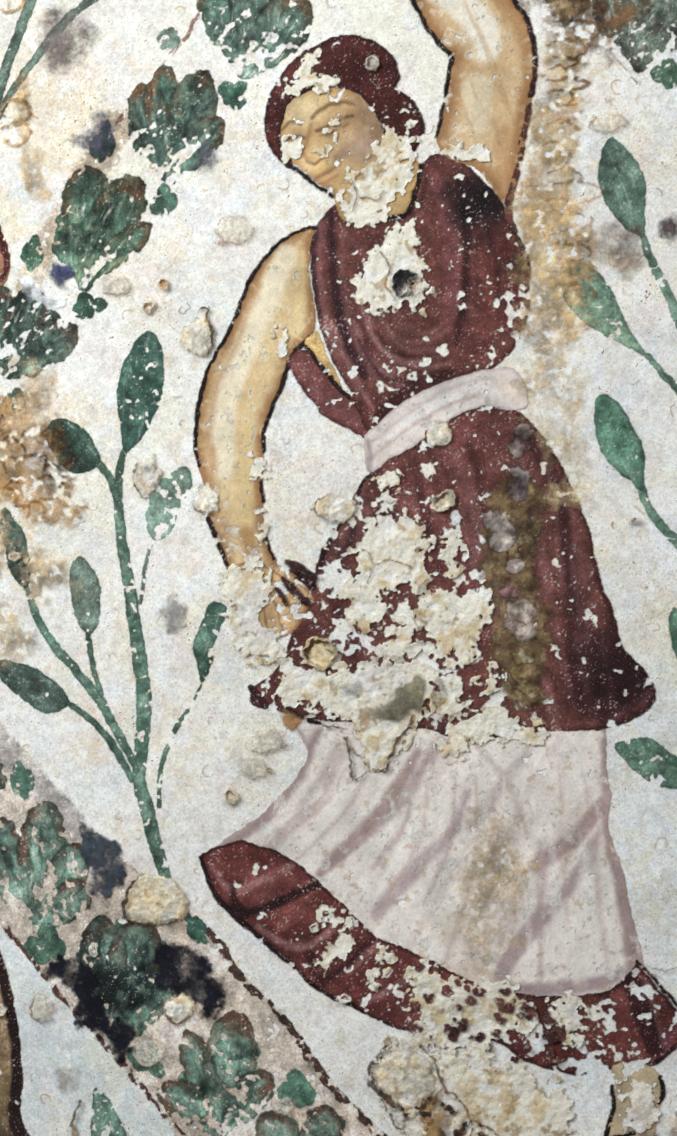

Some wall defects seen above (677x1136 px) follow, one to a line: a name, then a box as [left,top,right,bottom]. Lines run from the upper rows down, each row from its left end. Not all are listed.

peeling [281,48,340,98]
spalling [366,55,379,71]
peeling [281,114,340,164]
spalling [433,137,491,162]
spalling [336,121,433,317]
peeling [270,324,289,358]
peeling [246,450,271,480]
damp [479,423,558,710]
spalling [216,471,549,772]
peeling [309,904,355,977]
spalling [336,993,351,1004]
spalling [366,943,589,1136]